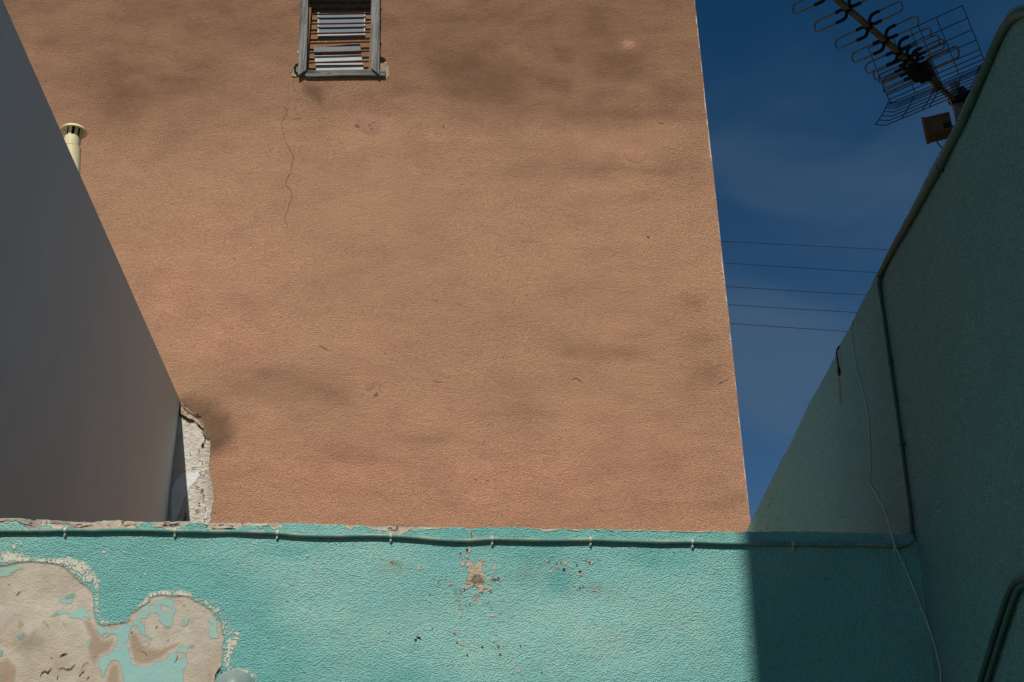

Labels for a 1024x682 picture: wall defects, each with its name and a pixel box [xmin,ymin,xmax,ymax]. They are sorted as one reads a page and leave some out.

flaking render [0,401,282,529]
flaking render [0,543,257,682]
peeling [449,546,501,646]
peeling [539,555,602,591]